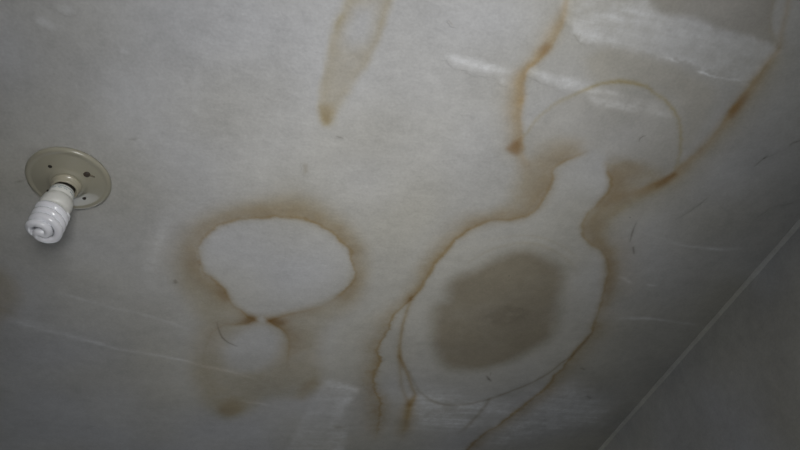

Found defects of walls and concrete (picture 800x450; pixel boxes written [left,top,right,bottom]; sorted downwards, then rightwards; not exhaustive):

damp [313,0,398,133]
damp [650,0,782,44]
damp [137,45,725,450]